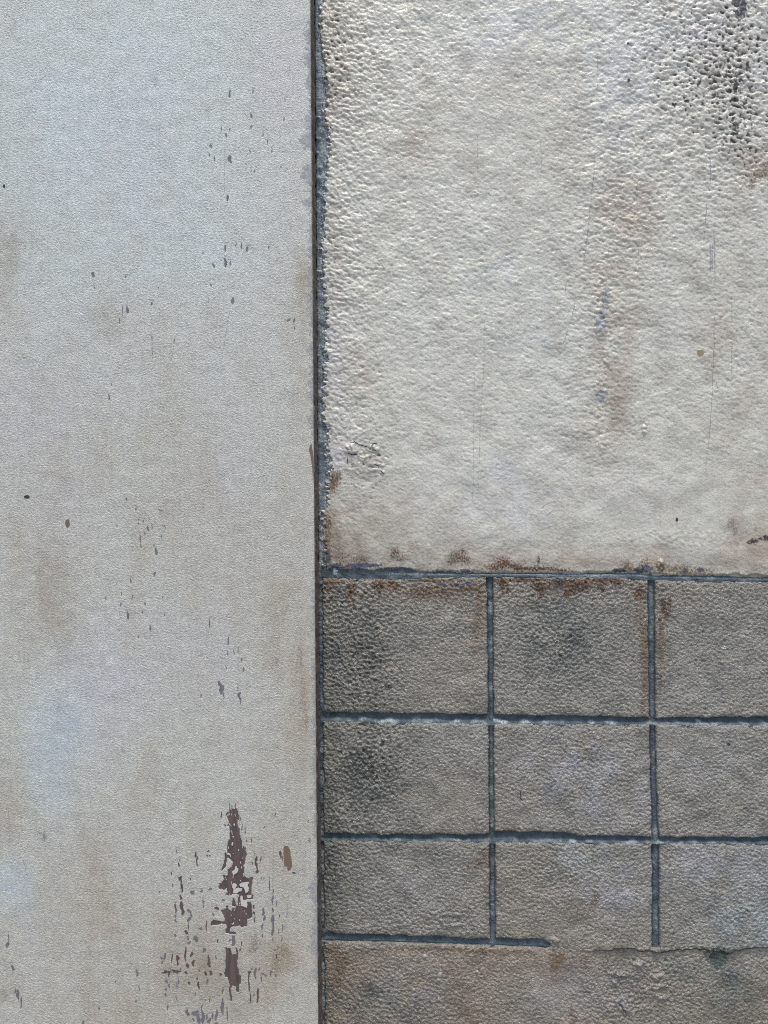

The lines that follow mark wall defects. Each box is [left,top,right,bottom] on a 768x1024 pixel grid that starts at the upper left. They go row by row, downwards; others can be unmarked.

rust [489,556,715,601]
peeling [160,804,283,1024]